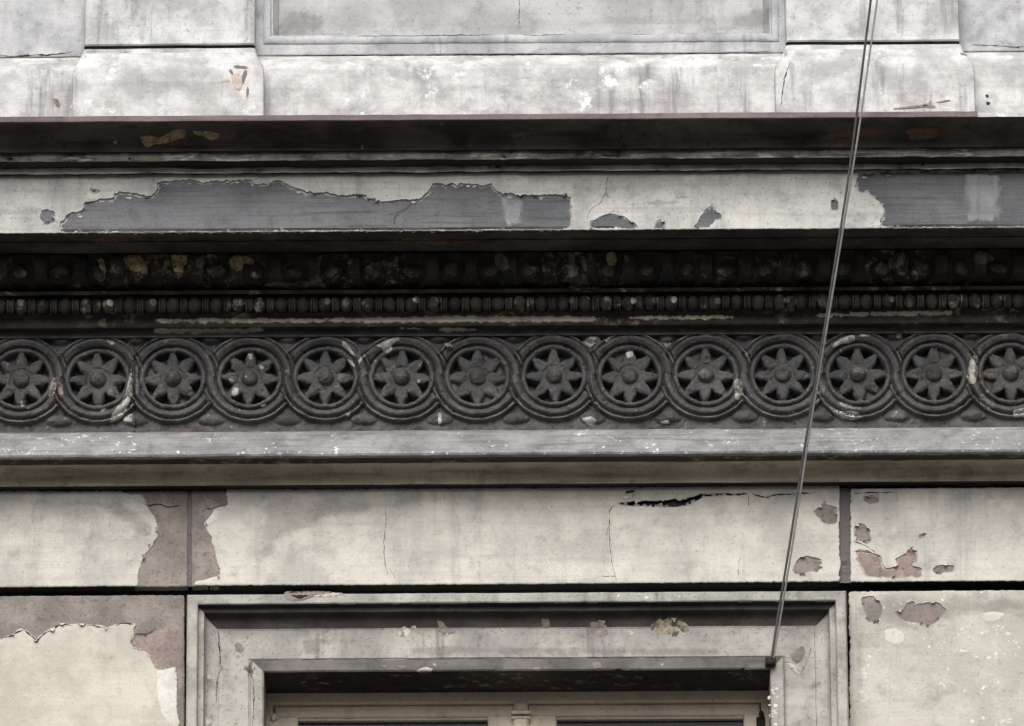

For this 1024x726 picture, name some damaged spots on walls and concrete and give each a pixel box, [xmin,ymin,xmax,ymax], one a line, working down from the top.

flaking render [220,65,249,101]
peeling [39,180,572,233]
peeling [589,214,638,229]
peeling [694,205,722,229]
peeling [855,169,1024,228]
flaking render [814,502,838,525]
crack [602,504,617,582]
flaking render [793,556,822,576]
flaking render [854,523,955,579]
flaking render [0,490,228,726]
flaking render [651,618,689,637]
flaking render [861,596,946,646]